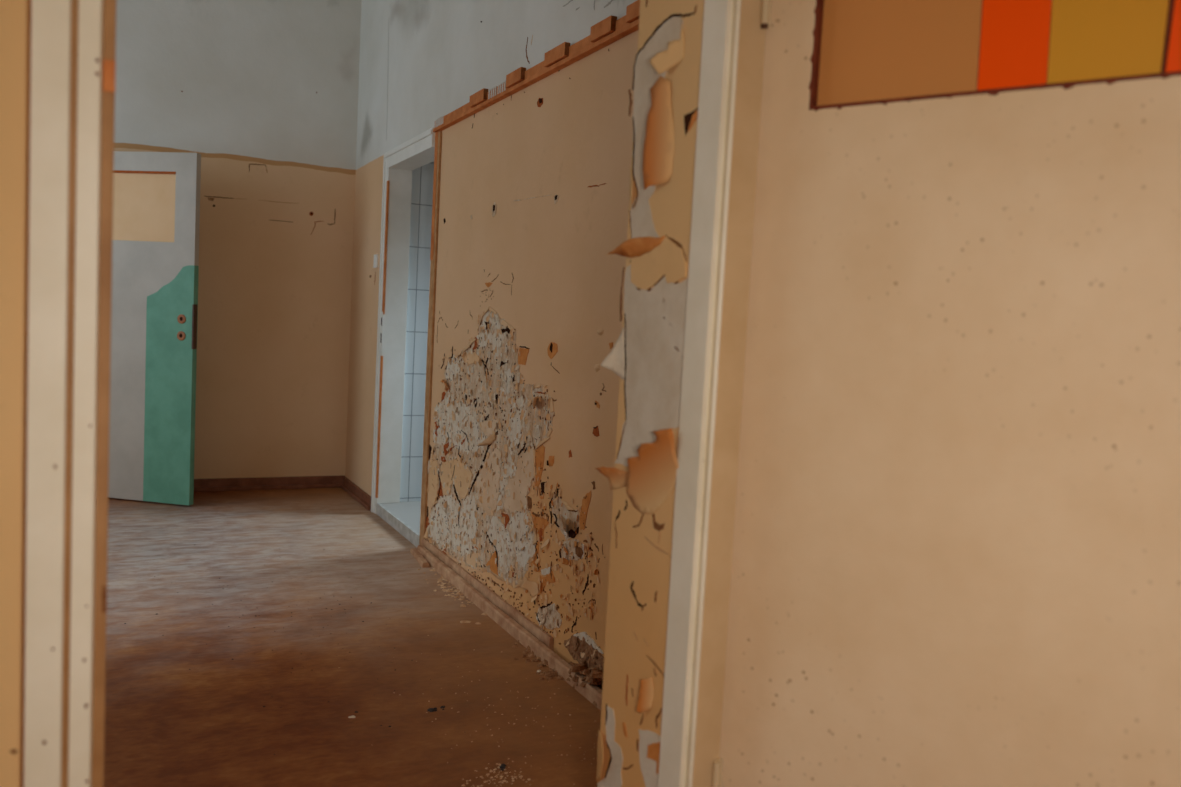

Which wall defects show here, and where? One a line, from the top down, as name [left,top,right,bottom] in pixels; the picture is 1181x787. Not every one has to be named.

peeling [601,5,704,467]
peeling [424,306,604,682]
peeling [652,514,665,544]
peeling [596,704,623,787]
peeling [637,729,661,787]